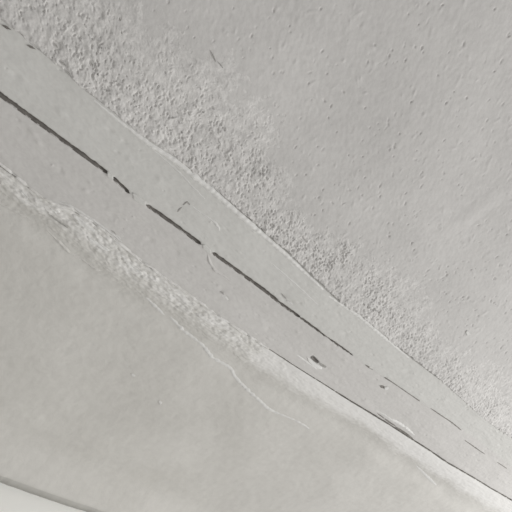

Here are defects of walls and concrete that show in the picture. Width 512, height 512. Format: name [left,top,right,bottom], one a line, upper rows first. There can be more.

crack [0,92,129,193]
crack [146,205,201,244]
crack [210,185,340,302]
crack [213,252,352,355]
crack [145,297,309,429]
peeling [297,355,327,369]
crack [269,349,512,501]
peeling [376,410,415,439]